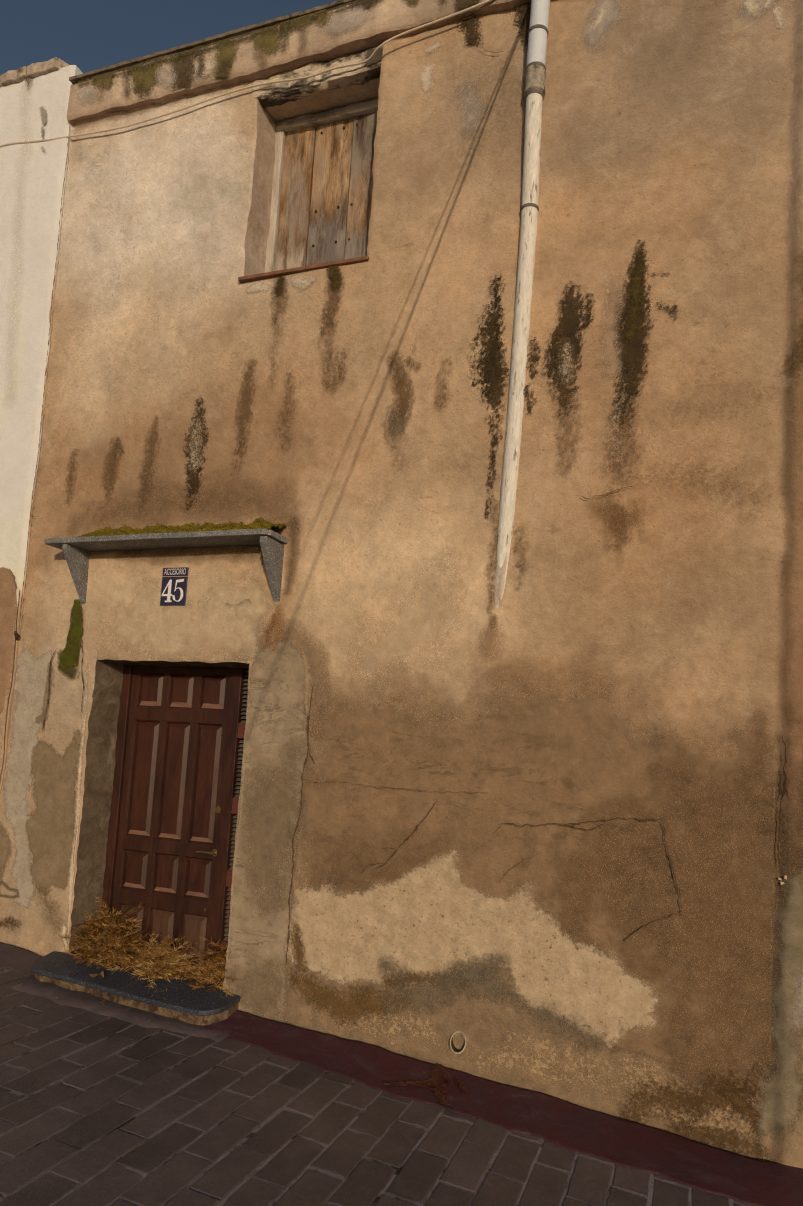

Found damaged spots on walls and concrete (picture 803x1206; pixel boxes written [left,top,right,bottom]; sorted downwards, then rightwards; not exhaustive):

water stain [78,0,377,116]
water stain [513,2,531,52]
water stain [104,397,262,518]
water stain [389,355,421,448]
water stain [469,275,509,631]
water stain [523,280,595,474]
mould [606,240,679,477]
flaking render [0,567,54,909]
flaking render [61,668,88,951]
water stain [234,627,799,1156]
flaking render [284,850,766,1161]
crack [494,817,684,918]